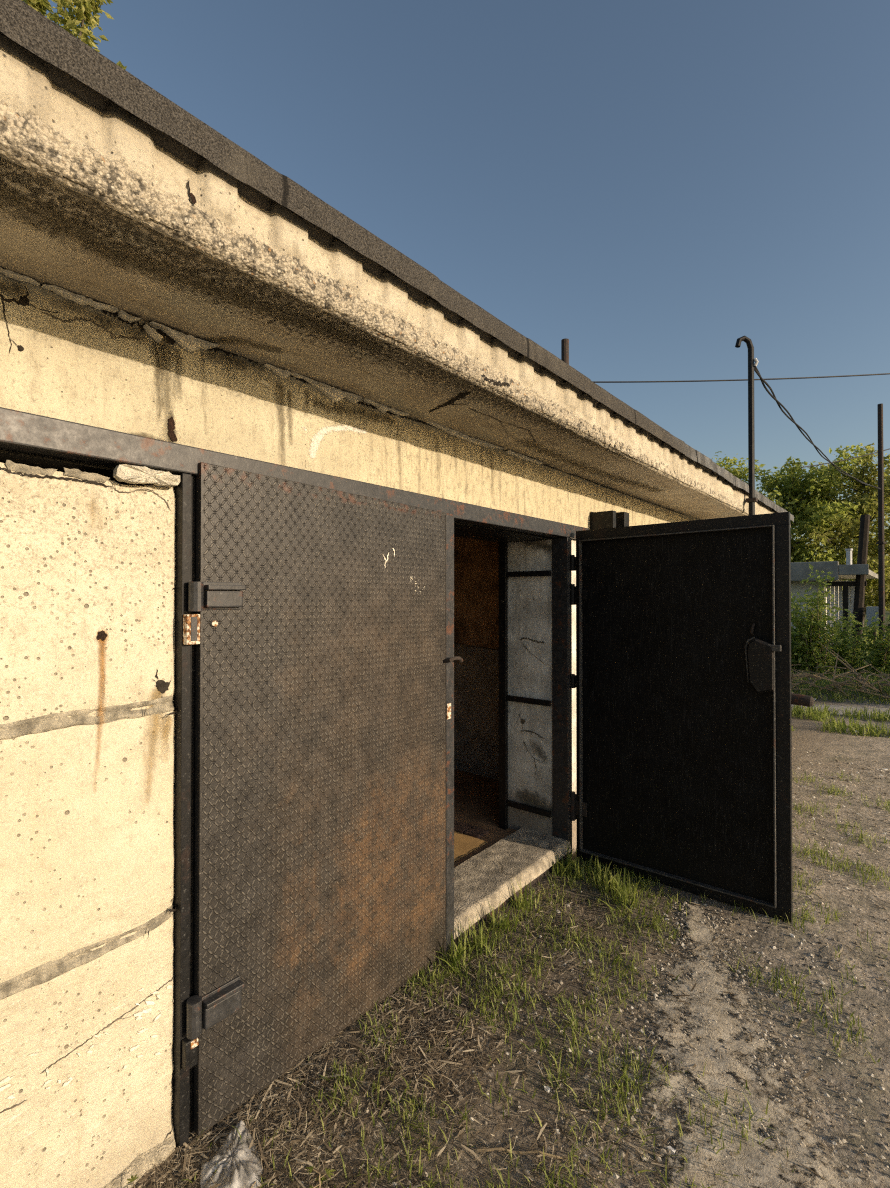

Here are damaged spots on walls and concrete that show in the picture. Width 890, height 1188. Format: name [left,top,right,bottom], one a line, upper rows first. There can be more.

crack [0,284,176,353]
crack [210,348,264,365]
leakage [0,128,657,468]
spalling [0,99,749,515]
crack [358,374,684,515]
corrosion [97,630,108,711]